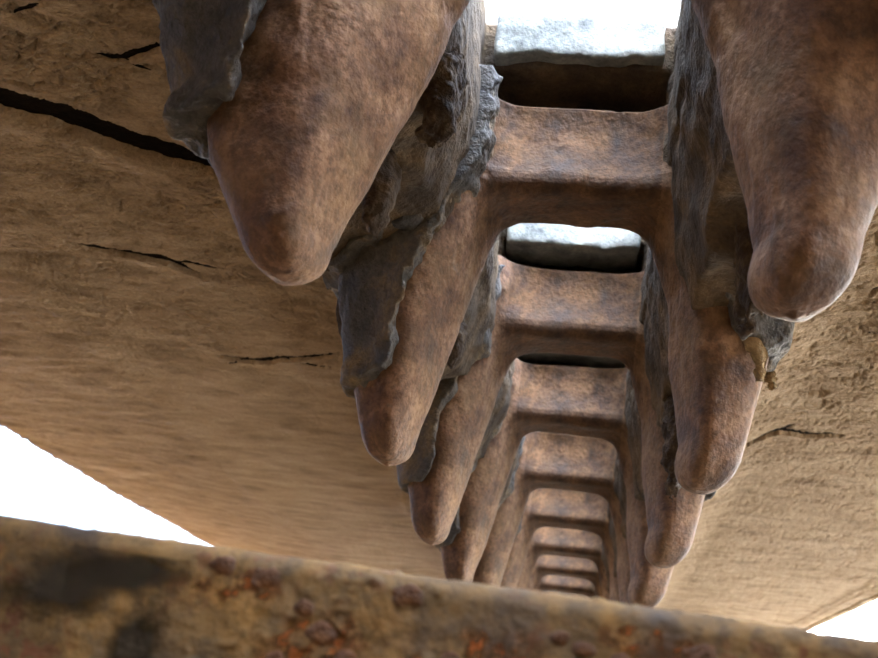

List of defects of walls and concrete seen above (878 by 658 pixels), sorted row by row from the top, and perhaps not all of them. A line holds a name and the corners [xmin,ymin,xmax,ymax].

crack [14,3,39,13]
crack [97,42,160,70]
crack [0,87,211,166]
crack [79,243,224,273]
crack [226,352,339,367]
crack [753,423,830,440]
rust [198,555,281,601]
rust [392,583,423,608]
rust [253,599,366,658]